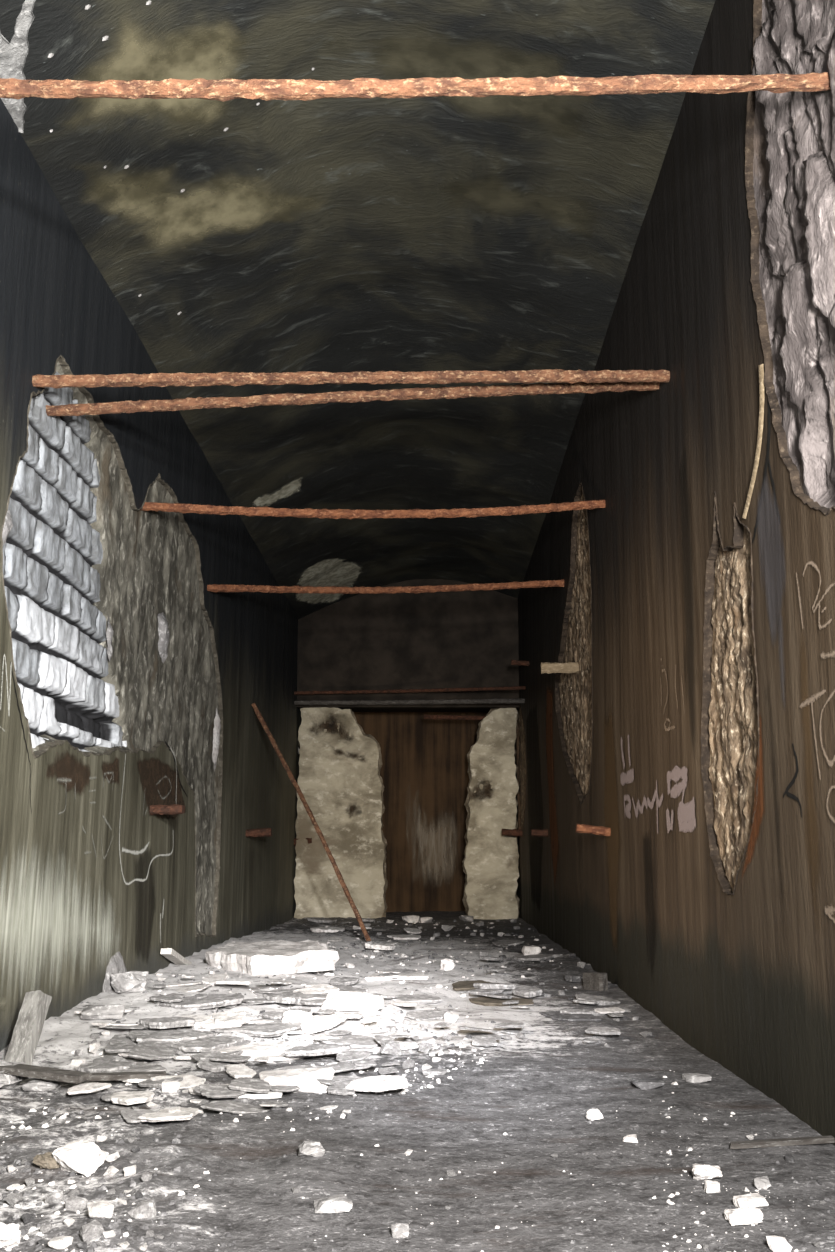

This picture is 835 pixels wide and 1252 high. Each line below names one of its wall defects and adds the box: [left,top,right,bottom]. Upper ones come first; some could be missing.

spalling [1,98,26,133]
spalling [0,0,35,80]
spalling [700,0,835,895]
spalling [1,355,223,938]
spalling [555,482,593,805]